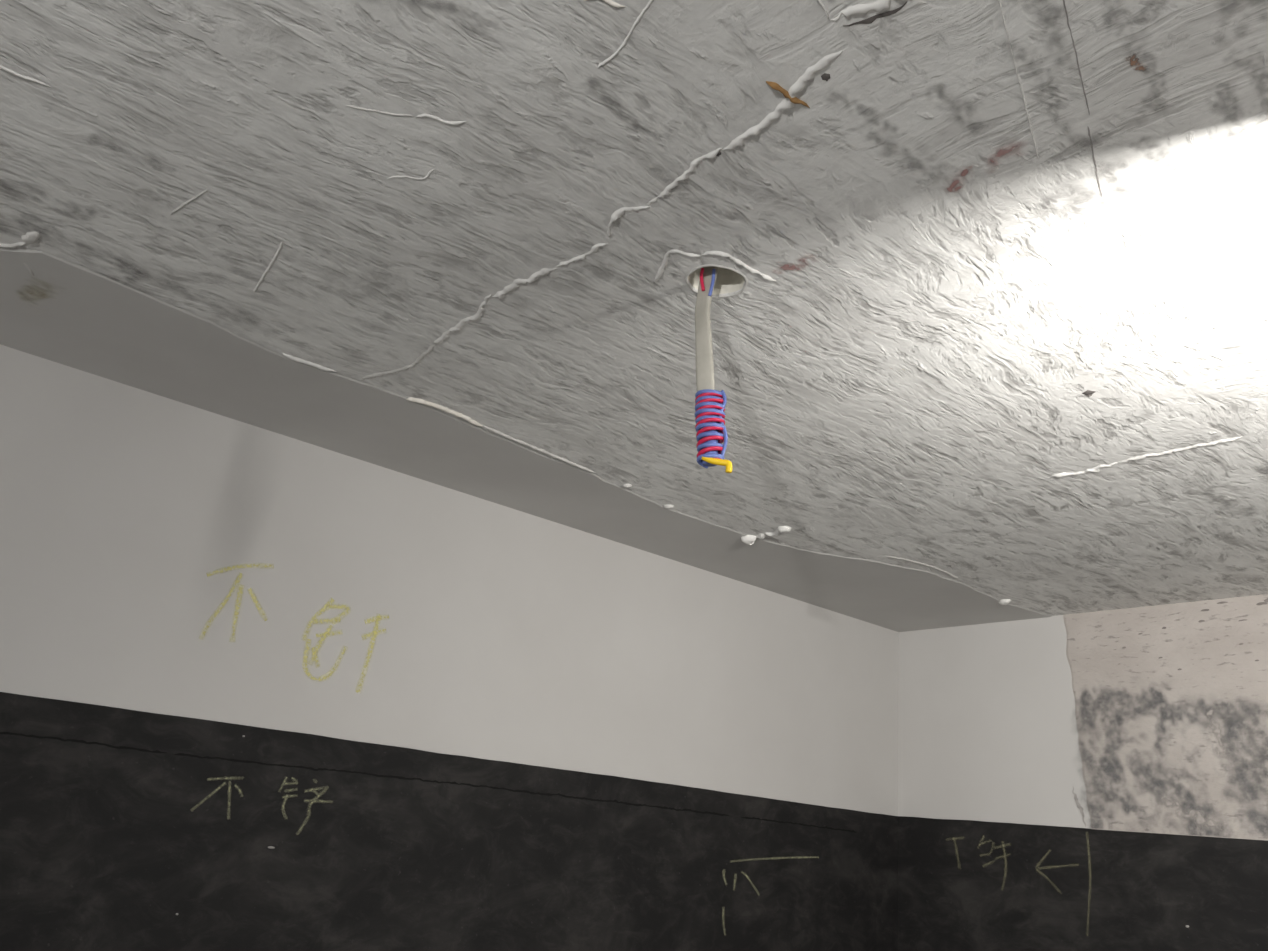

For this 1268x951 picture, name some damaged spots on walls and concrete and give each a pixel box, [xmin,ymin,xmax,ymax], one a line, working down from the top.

crack [361,0,907,381]
leakage [1081,689,1268,835]